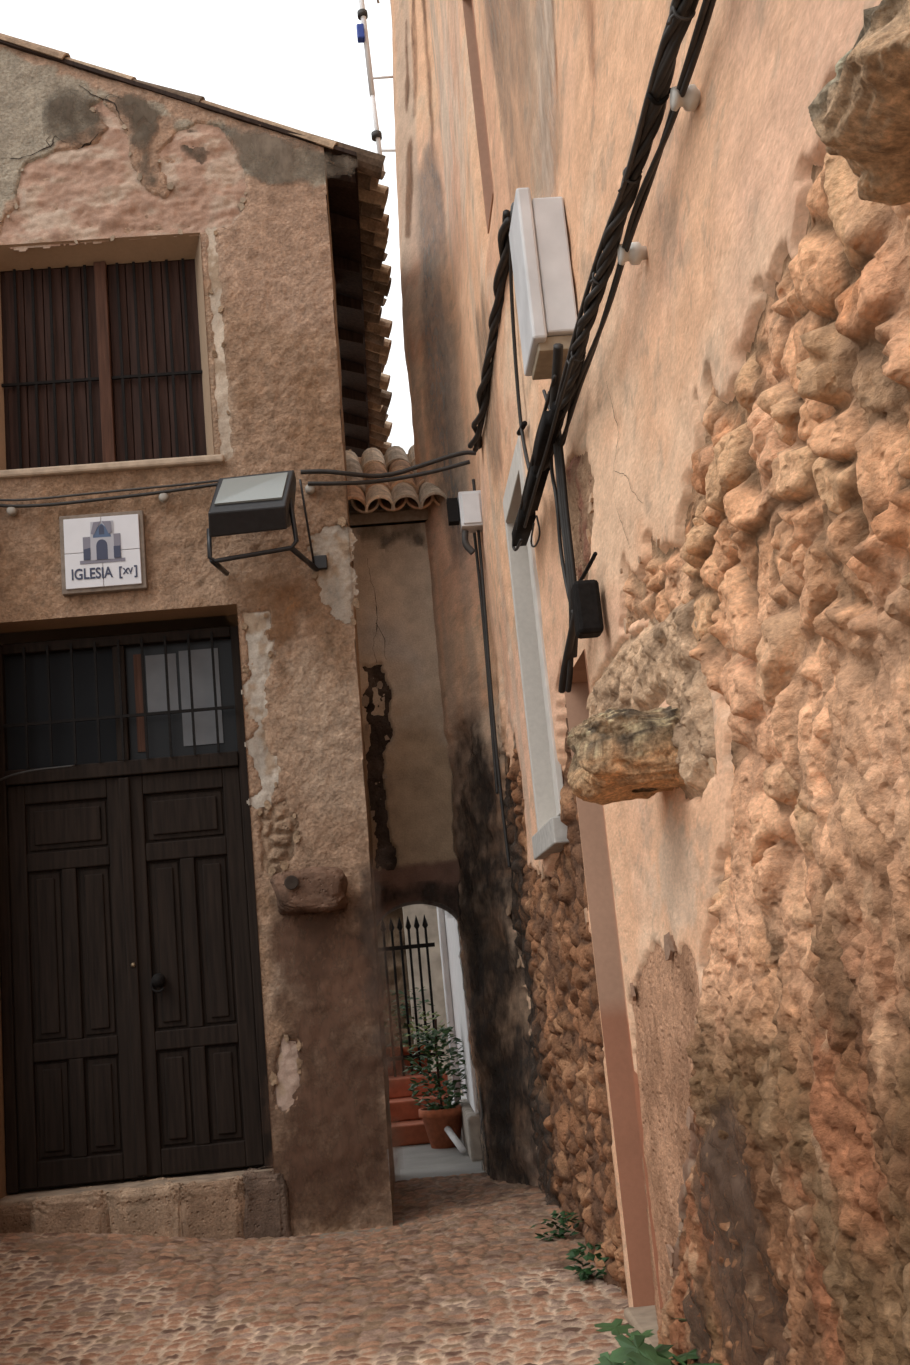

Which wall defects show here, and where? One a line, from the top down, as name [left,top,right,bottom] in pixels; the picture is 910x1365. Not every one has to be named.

water stain [45,94,99,141]
water stain [116,94,159,182]
water stain [183,130,205,164]
water stain [227,128,356,183]
peeling [0,100,247,465]
peeling [307,516,359,626]
spalling [566,452,595,581]
peeling [241,611,301,876]
spalling [586,153,910,1365]
water stain [272,720,559,1221]
spalling [506,705,628,1297]
peeling [269,1034,303,1111]